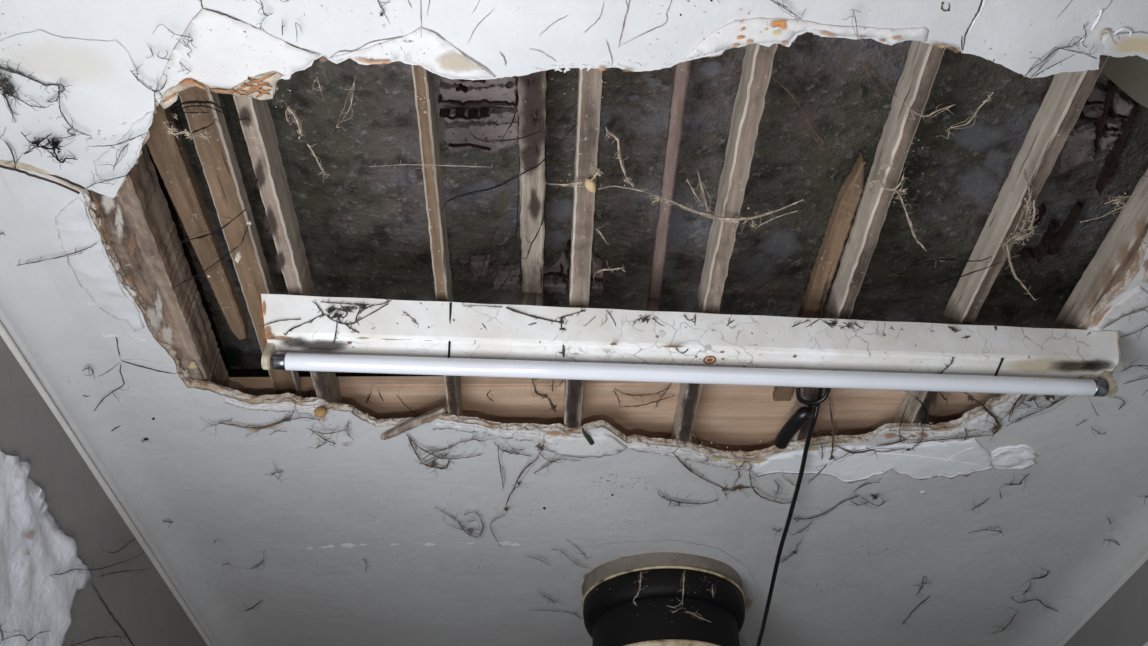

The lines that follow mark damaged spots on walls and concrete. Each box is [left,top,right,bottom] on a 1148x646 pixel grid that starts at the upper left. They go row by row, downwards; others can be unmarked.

rust [764,21,788,46]
peeling [683,17,929,60]
peeling [155,9,519,154]
flaking render [1055,79,1137,195]
flaking render [1019,202,1082,263]
flaking render [470,253,521,291]
flaking render [543,239,571,294]
flaking render [589,251,605,298]
peeling [1088,260,1148,332]
flaking render [222,396,319,416]
peeling [432,394,1026,494]